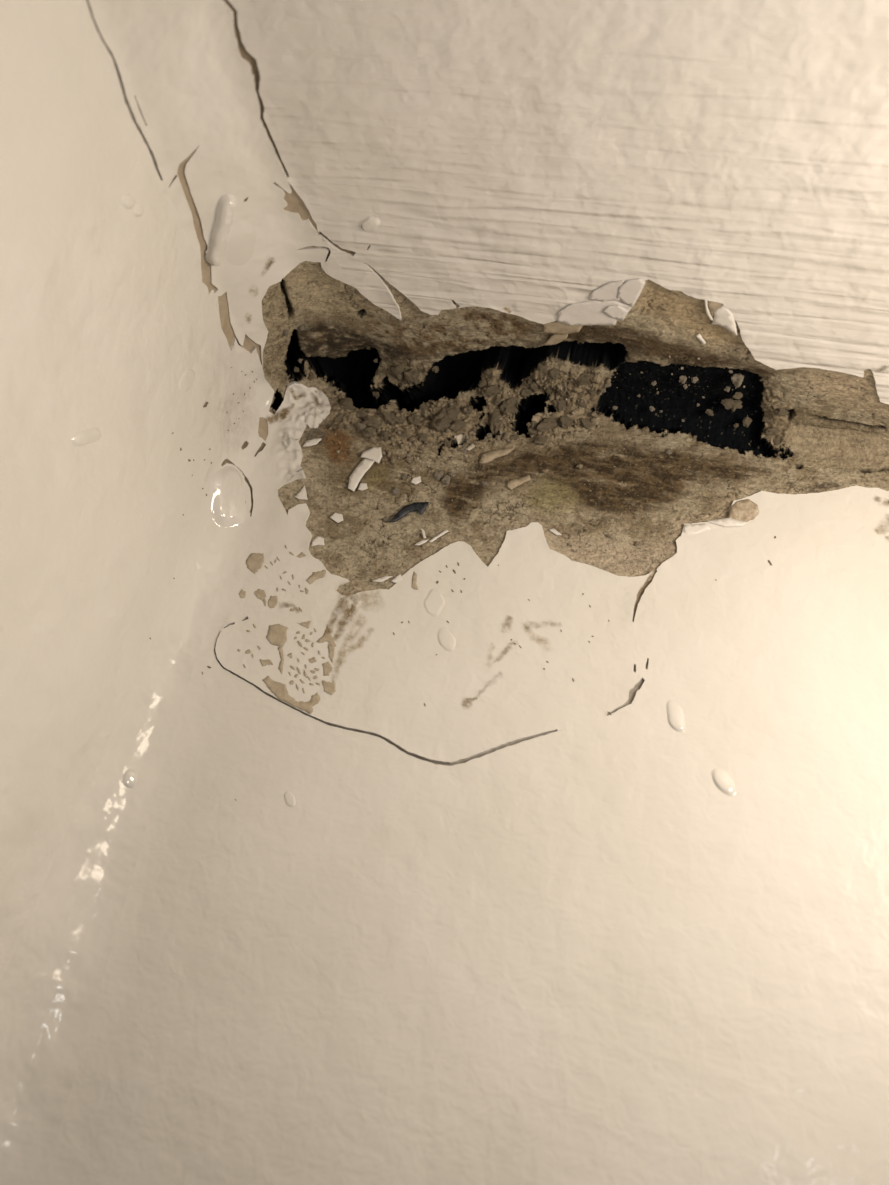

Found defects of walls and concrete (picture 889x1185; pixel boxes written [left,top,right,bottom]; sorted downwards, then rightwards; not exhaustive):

crack [89,10,161,179]
crack [224,0,288,175]
spalling [239,261,889,619]
peeling [238,607,336,714]
crack [214,617,556,766]
crack [607,659,649,716]